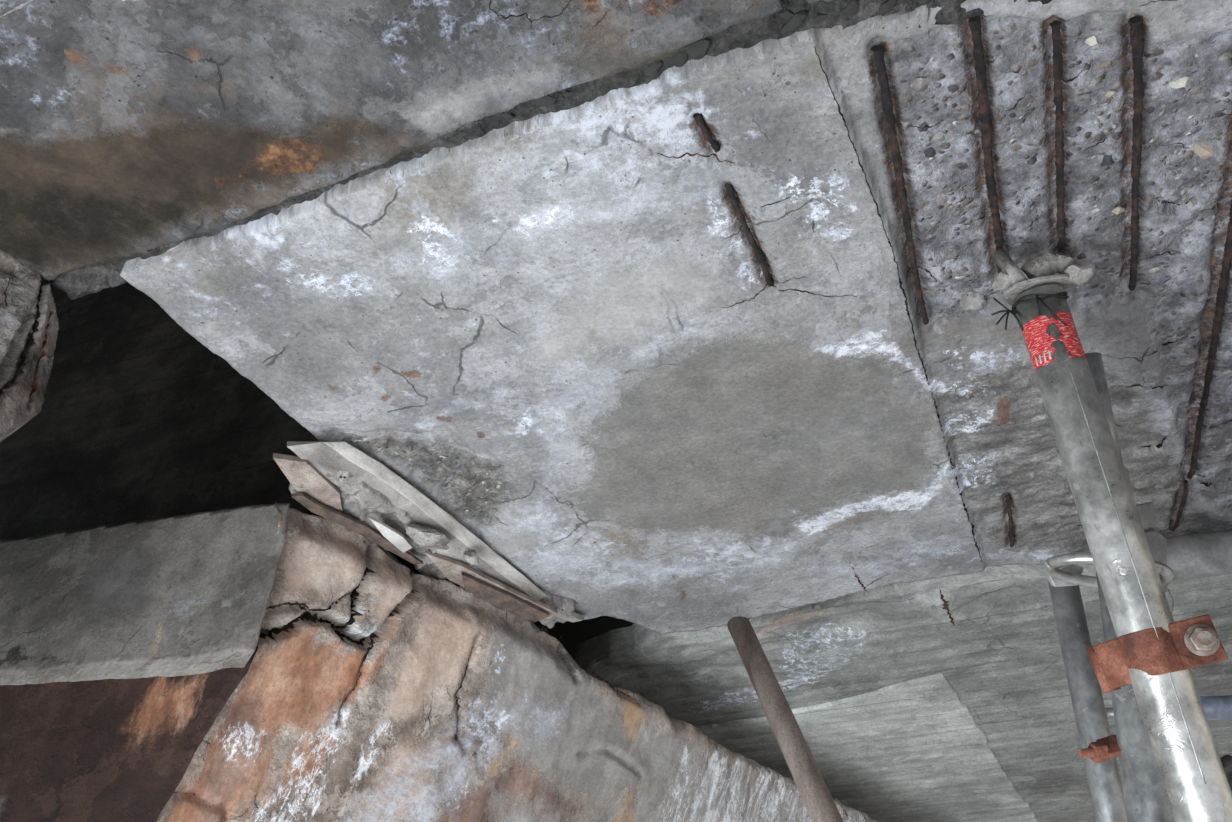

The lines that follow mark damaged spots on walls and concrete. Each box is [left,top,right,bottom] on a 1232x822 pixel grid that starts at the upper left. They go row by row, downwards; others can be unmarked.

crack [0,282,52,400]
water stain [0,113,389,268]
water stain [287,269,371,297]
crack [814,46,982,561]
spalling [871,15,1232,554]
corrosion [1116,14,1153,277]
corrosion [1169,108,1232,525]
corrosion [128,676,205,743]
corrosion [165,620,398,822]
crack [259,546,415,718]
peeling [369,516,412,553]
water stain [503,330,1022,585]